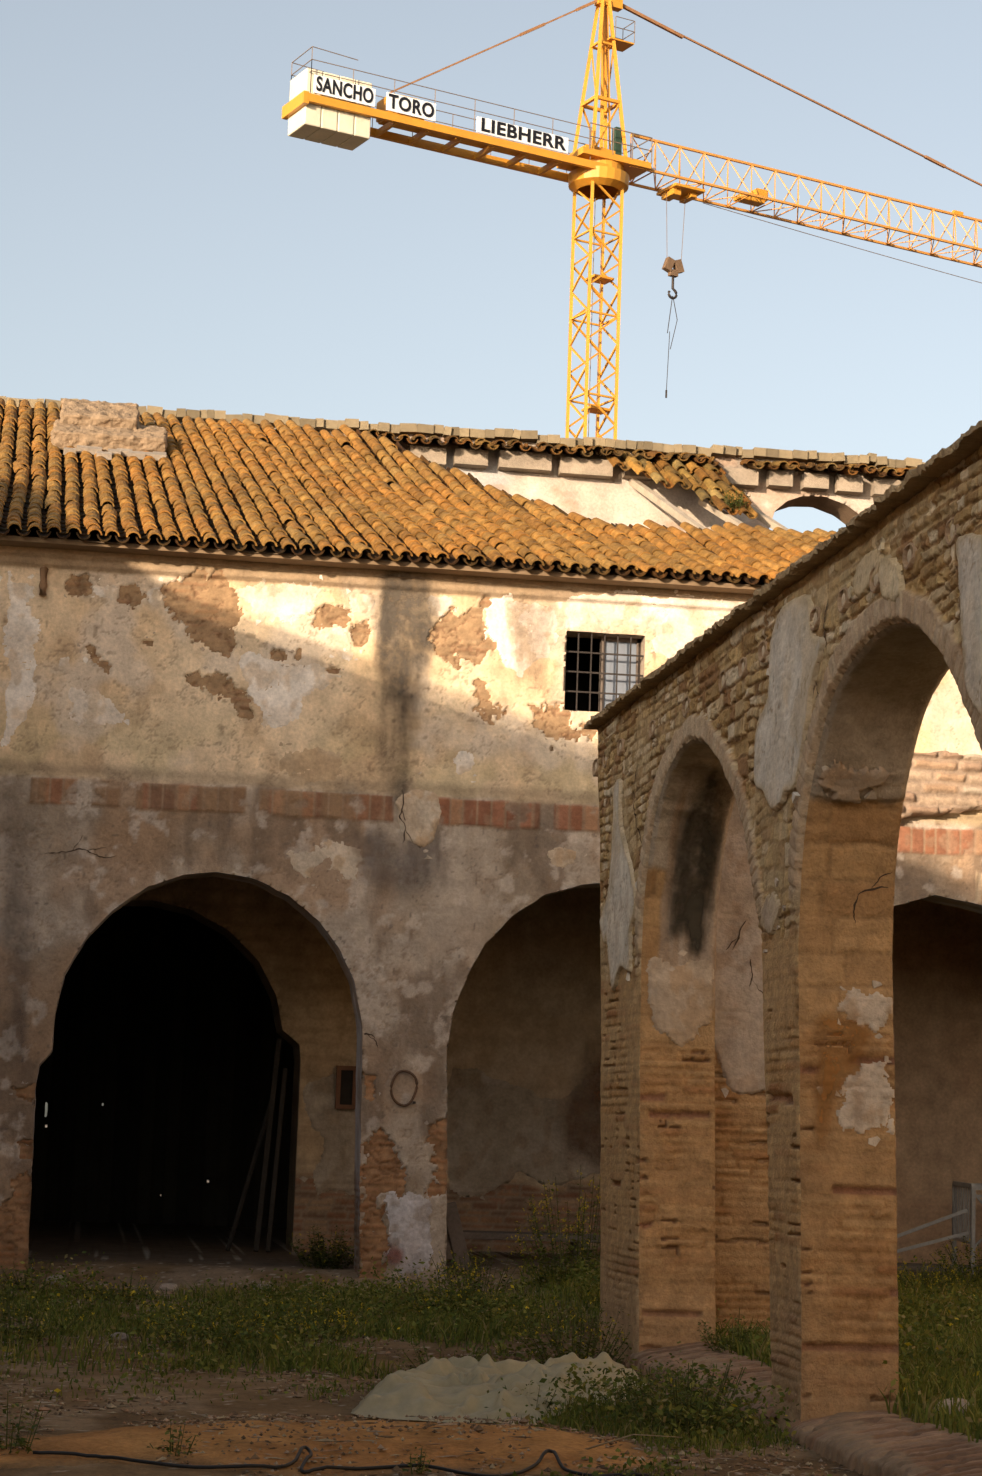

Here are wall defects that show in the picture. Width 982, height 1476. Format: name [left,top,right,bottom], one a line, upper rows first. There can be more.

peeling [0,570,41,747]
spalling [58,569,375,791]
leakage [377,573,435,717]
spalling [528,702,598,751]
peeling [427,589,745,725]
leakage [670,771,722,955]
peeling [837,980,893,1039]
peeling [299,1067,601,1279]
peeling [816,1056,895,1147]